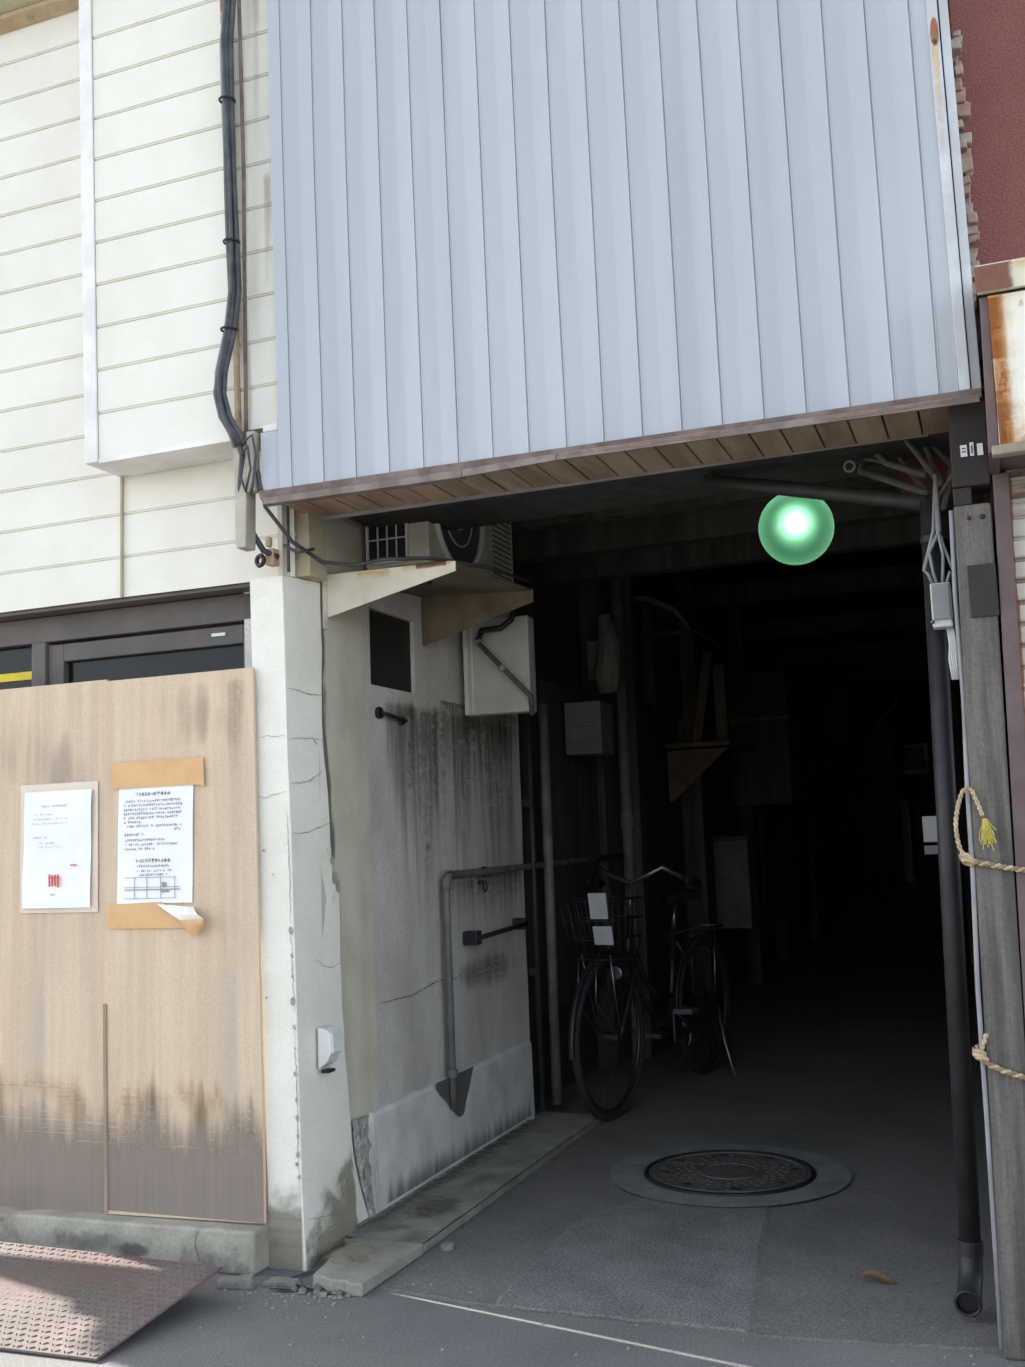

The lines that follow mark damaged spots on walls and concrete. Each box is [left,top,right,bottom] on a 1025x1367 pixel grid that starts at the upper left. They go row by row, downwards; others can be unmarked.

corrosion [930,18,939,76]
corrosion [974,257,1025,444]
corrosion [1009,469,1025,728]
leakage [397,700,514,794]
leakage [0,1099,535,1270]